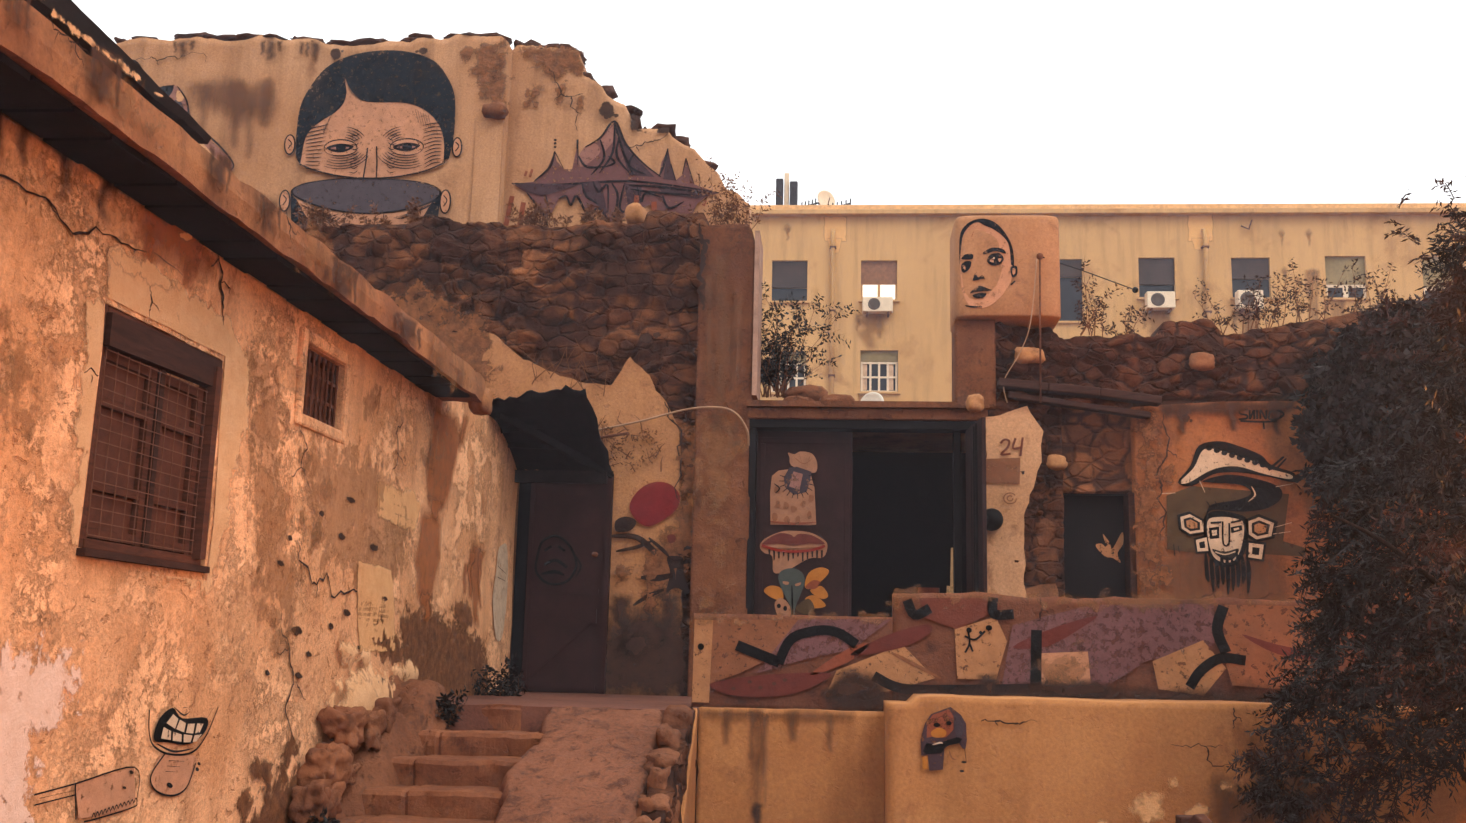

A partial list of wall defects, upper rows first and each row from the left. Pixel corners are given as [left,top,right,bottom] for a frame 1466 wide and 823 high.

damp [195,81,270,190]
crack [0,174,230,325]
crack [297,541,358,607]
peeling [0,631,84,823]
peeling [1131,778,1178,823]
peeling [1185,806,1208,815]